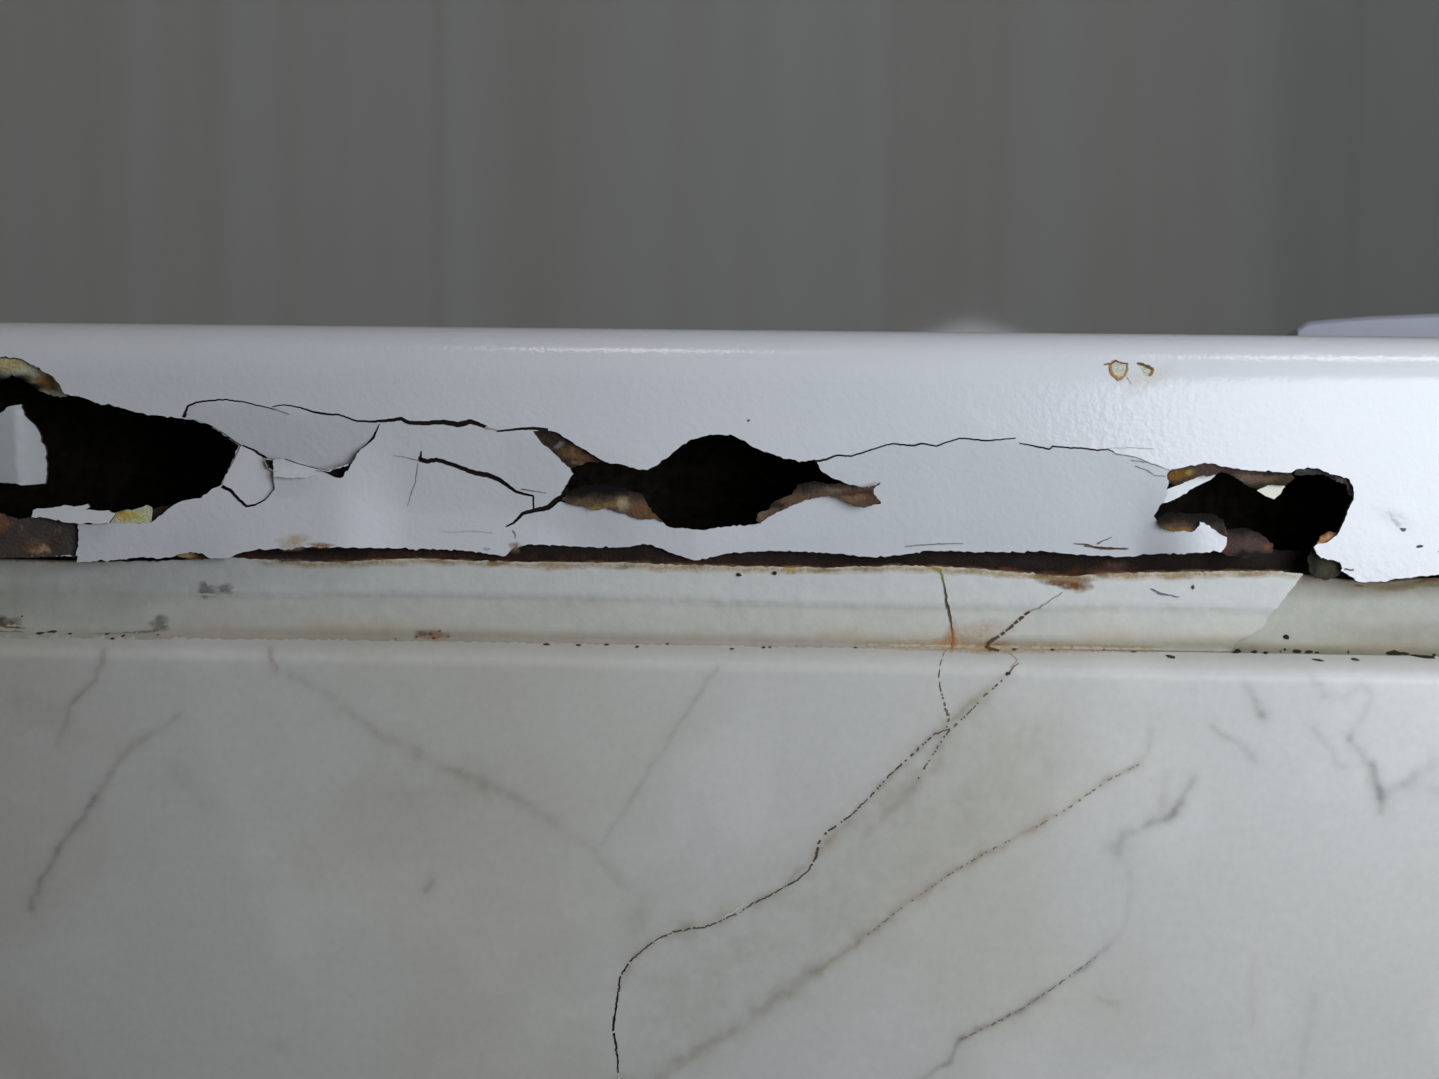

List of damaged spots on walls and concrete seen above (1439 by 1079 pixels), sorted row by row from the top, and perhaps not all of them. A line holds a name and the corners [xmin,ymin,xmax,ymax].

peeling [1105,360,1154,384]
peeling [0,404,49,485]
corrosion [534,429,605,468]
peeling [32,504,116,524]
corrosion [756,481,880,524]
peeling [1163,475,1215,503]
corrosion [1167,463,1353,496]
peeling [1256,485,1285,499]
corrosion [0,513,79,558]
corrosion [234,512,1364,589]
crack [1074,537,1129,550]
crack [612,543,1063,1079]